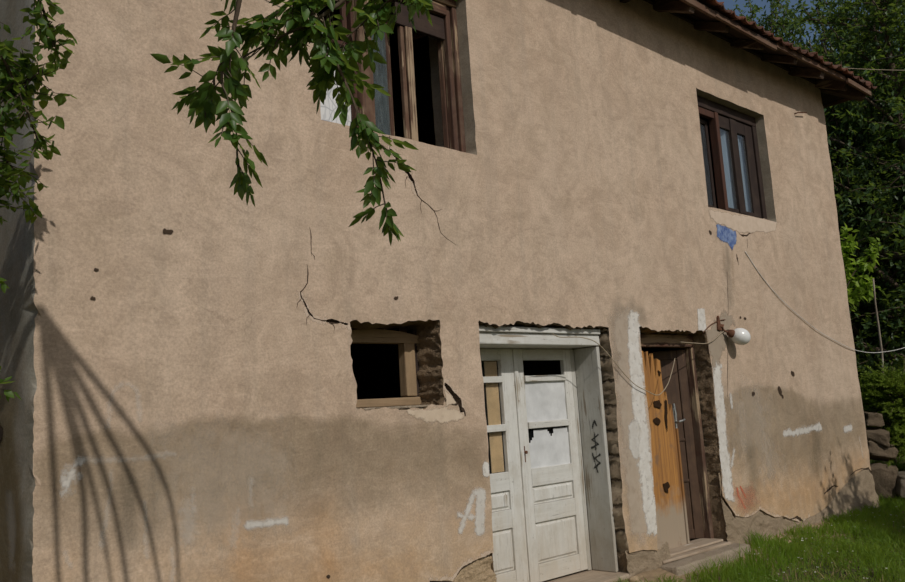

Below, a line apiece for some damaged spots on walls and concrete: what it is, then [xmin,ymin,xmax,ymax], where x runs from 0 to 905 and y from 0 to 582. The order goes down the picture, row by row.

crack [386,136,456,245]
crack [295,230,351,330]
crack [443,378,468,416]
spalling [719,469,881,544]
spalling [442,555,497,582]